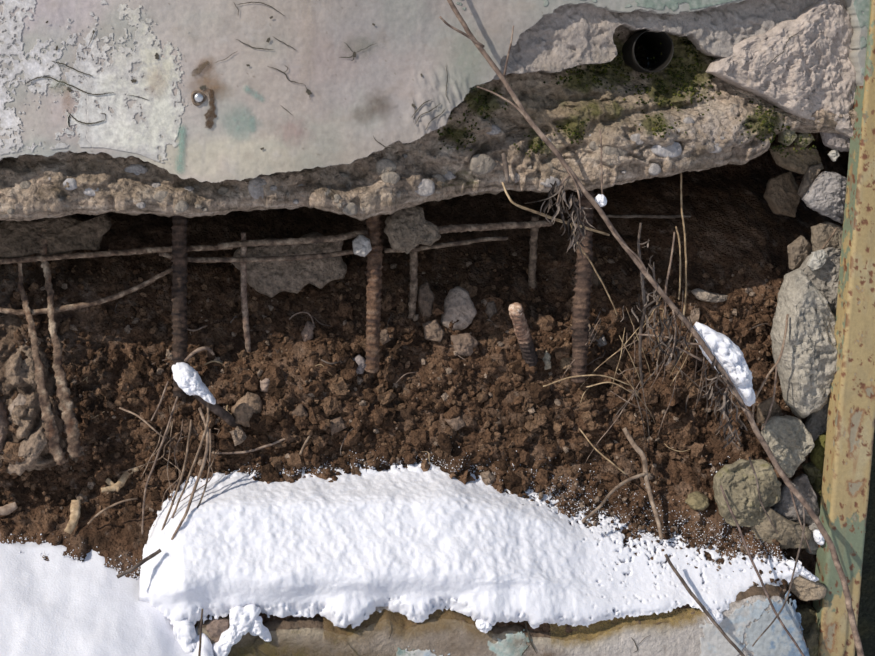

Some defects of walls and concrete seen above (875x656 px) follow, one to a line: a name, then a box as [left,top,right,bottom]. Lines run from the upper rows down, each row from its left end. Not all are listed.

spalling [0,0,857,221]
spalling [0,294,78,472]
peeling [395,645,450,656]
peeling [487,629,533,656]
peeling [699,591,810,656]